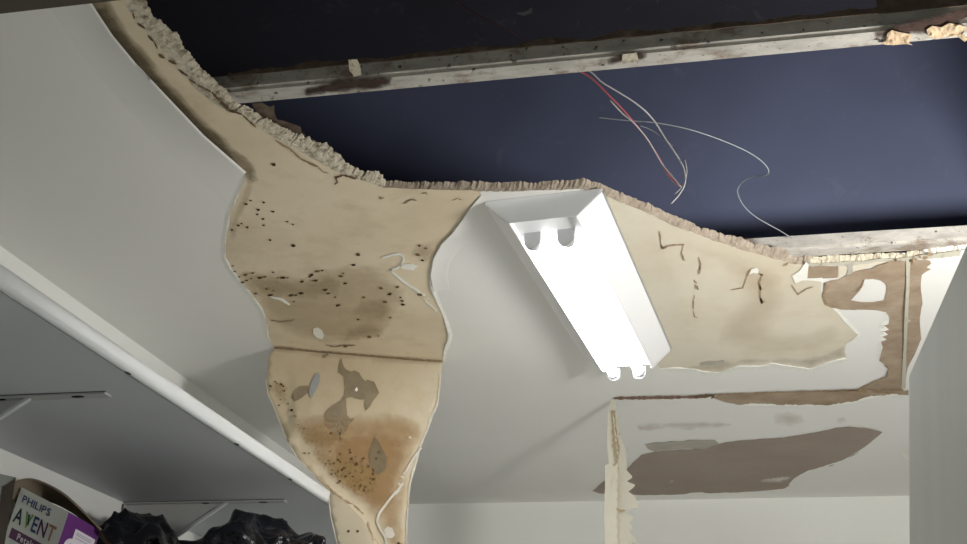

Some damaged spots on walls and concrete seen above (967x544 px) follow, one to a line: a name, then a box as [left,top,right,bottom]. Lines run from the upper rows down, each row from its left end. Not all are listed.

peeling [92,0,481,544]
damp [269,381,412,510]
peeling [126,0,931,376]
peeling [627,427,882,495]